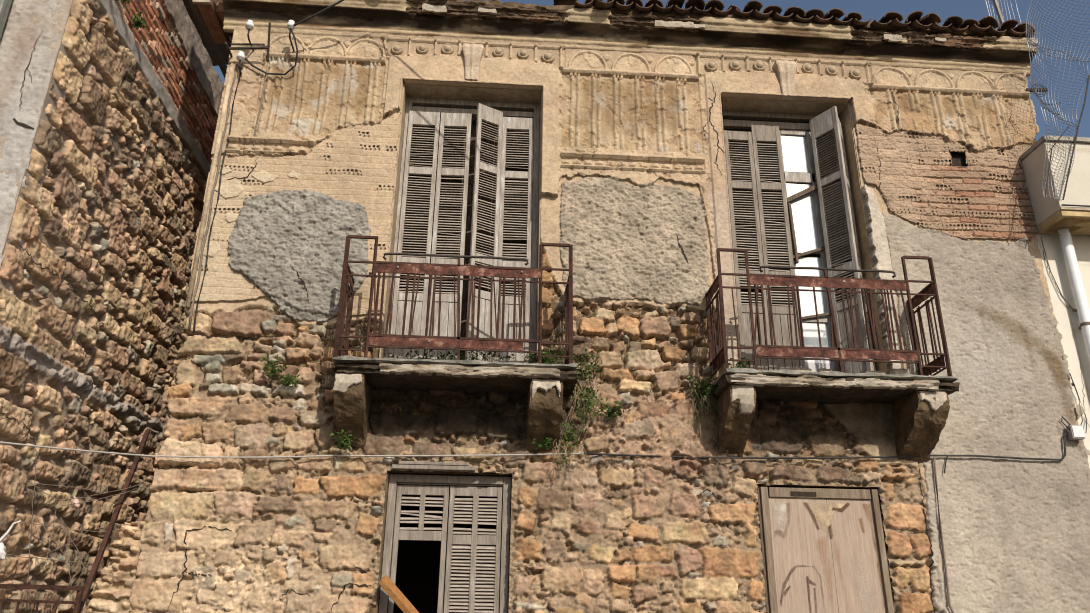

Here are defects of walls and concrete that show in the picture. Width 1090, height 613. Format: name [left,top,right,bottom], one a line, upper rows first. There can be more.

peeling [422,3,447,13]
peeling [478,7,497,15]
peeling [654,20,705,29]
crack [703,84,724,175]
flaking render [191,106,402,317]
flaking render [855,121,1038,241]
crack [16,241,108,332]
damp [1046,354,1062,383]